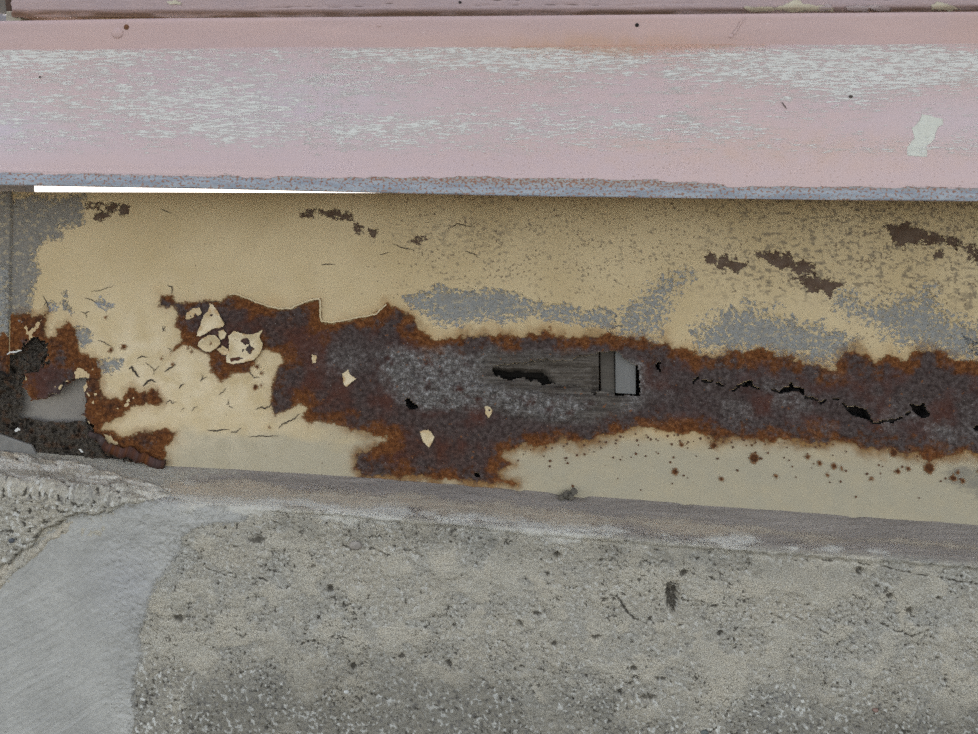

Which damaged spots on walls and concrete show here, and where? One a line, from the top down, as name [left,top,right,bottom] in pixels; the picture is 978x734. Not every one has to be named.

peeling [0,44,978,161]
peeling [185,303,263,365]
peeling [402,265,698,344]
peeling [685,248,978,371]
rust [0,311,175,469]
peeling [96,357,124,376]
peeling [342,370,356,387]
rust [157,294,978,488]
crack [692,377,778,392]
crack [801,392,849,410]
crack [869,411,911,424]